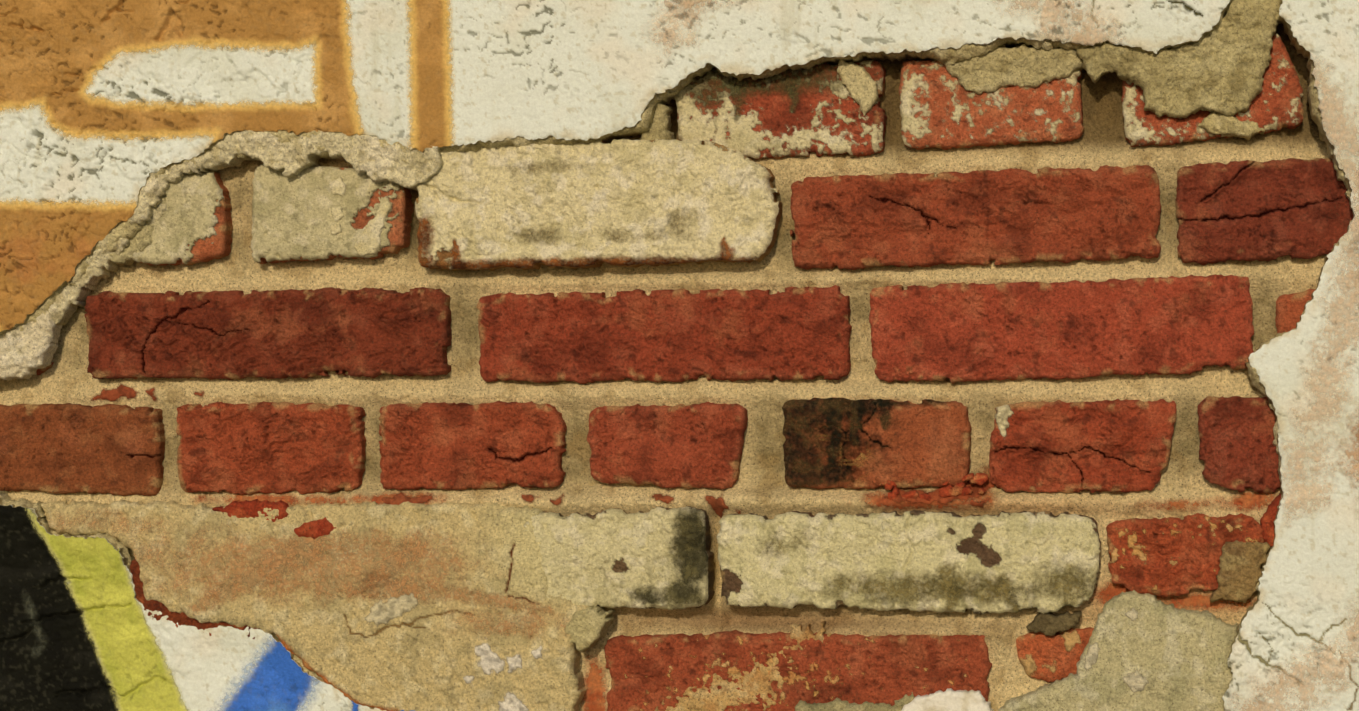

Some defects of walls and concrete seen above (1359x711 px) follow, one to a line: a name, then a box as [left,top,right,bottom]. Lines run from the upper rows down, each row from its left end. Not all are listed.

spalling [1162,0,1231,49]
peeling [19,38,1089,331]
peeling [1122,80,1234,146]
crack [1177,162,1342,221]
spalling [1238,20,1353,269]
spalling [1246,362,1283,510]
flaking render [0,491,278,639]
peeling [521,494,1147,653]
peeling [1163,516,1269,628]
peeling [499,693,528,711]
peeling [507,646,542,673]
crack [1238,600,1359,710]